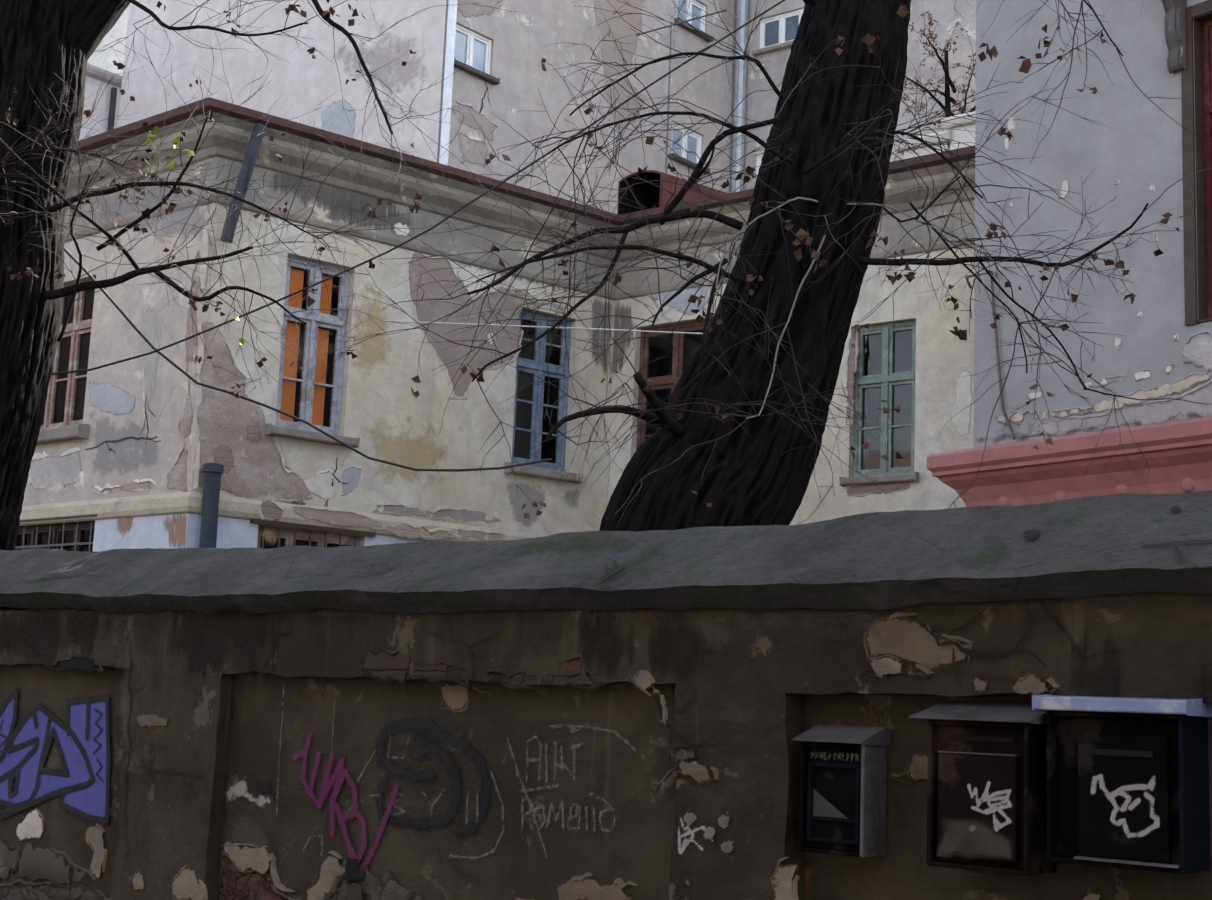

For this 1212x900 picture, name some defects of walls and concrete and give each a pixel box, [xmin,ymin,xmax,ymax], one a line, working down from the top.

spalling [457,0,504,17]
spalling [594,0,646,127]
spalling [451,100,498,167]
peeling [405,252,570,401]
spalling [27,226,504,541]
peeling [994,330,1212,438]
peeling [863,612,973,681]
peeling [169,841,424,900]
peeling [556,872,638,900]
peeling [770,856,801,900]